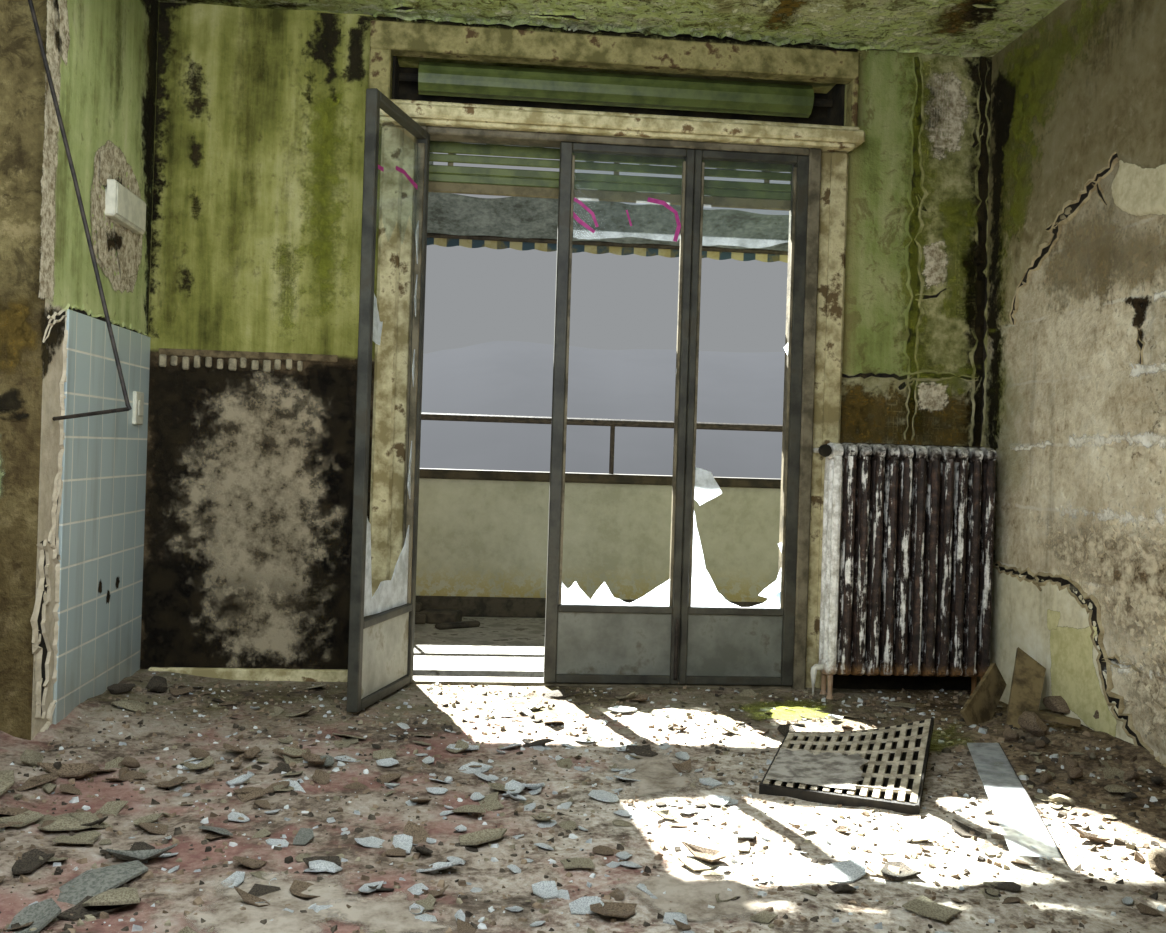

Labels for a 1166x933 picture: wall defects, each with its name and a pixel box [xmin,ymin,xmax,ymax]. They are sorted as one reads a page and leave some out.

flaking render [90,140,143,293]
leakage [142,0,858,337]
crack [371,2,1119,447]
leakage [840,56,1041,465]
leakage [1044,205,1166,307]
spalling [1125,296,1151,341]
peeling [1111,160,1166,216]
crack [30,303,148,732]
leakage [140,359,357,669]
crack [993,561,1166,767]
spalling [1039,516,1166,739]
leakage [1069,433,1166,448]